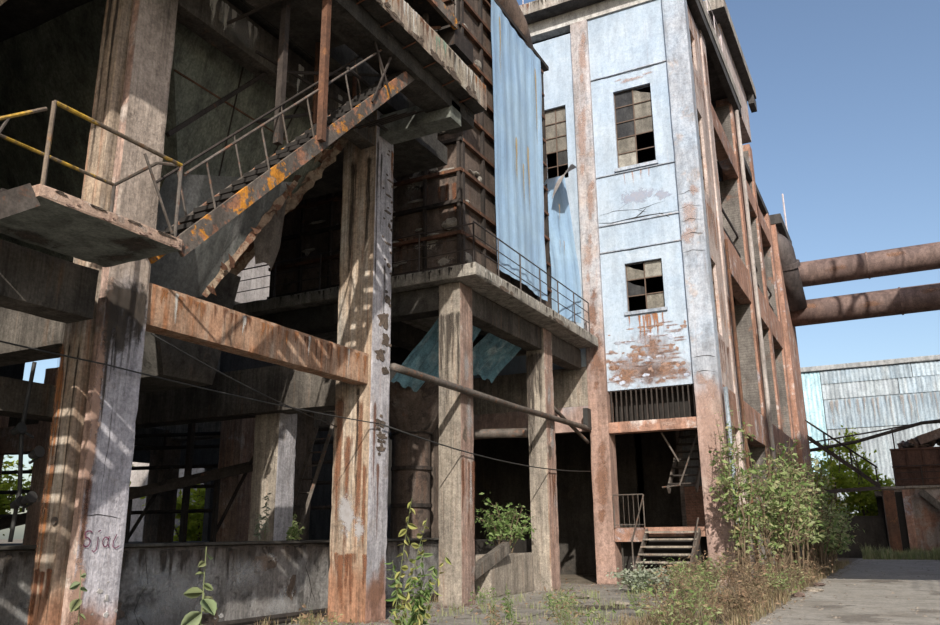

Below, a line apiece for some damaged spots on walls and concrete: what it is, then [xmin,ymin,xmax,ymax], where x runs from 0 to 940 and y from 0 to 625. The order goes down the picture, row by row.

corrosion [220,227,261,270]
damp [99,283,147,420]
corrosion [161,284,367,375]
peeling [589,290,691,389]
corrosion [29,348,64,625]
corrosion [78,472,91,564]
corrosion [334,398,379,542]
corrosion [331,552,385,613]